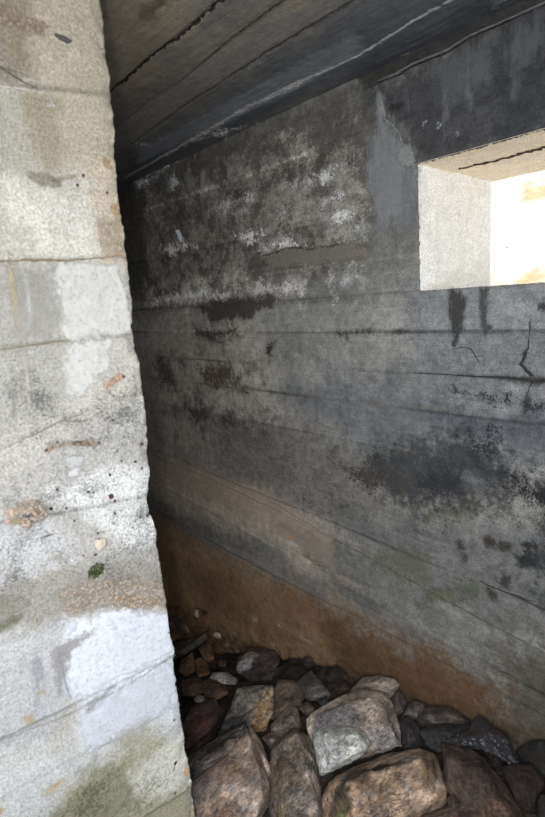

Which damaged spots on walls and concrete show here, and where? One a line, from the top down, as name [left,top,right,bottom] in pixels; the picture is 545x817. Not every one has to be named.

crack [111,0,225,91]
crack [131,0,358,145]
crack [369,1,545,88]
damp [431,29,492,135]
damp [233,88,421,260]
damp [160,235,198,258]
damp [145,276,308,344]
damp [448,288,466,347]
damp [479,288,492,334]
crack [418,318,545,409]
damp [337,423,545,516]
damp [484,523,545,595]